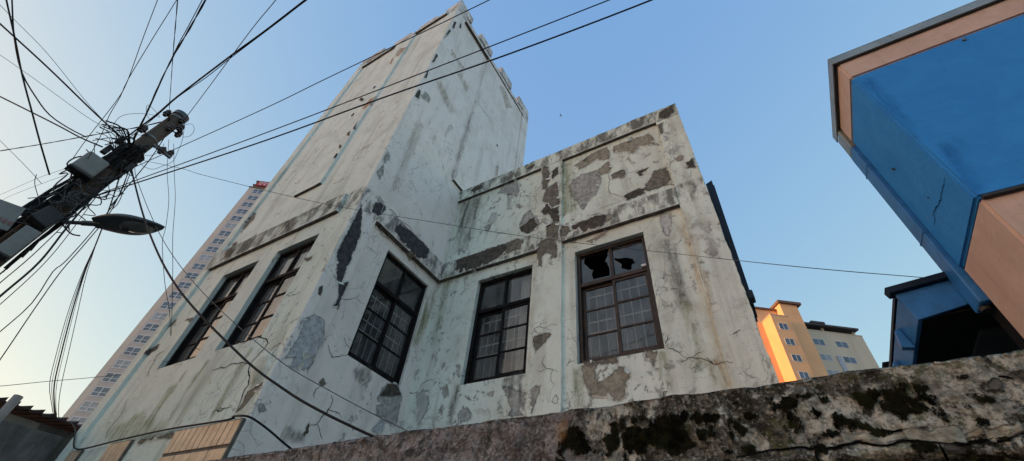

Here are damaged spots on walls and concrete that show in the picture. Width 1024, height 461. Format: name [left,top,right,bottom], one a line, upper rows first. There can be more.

peeling [455,106,696,273]
spalling [333,202,386,310]
crack [212,336,280,412]
peeling [286,315,325,372]
crack [307,338,350,440]
peeling [372,382,403,435]
peeling [581,356,630,401]
crack [665,336,733,365]
crack [735,420,1024,461]